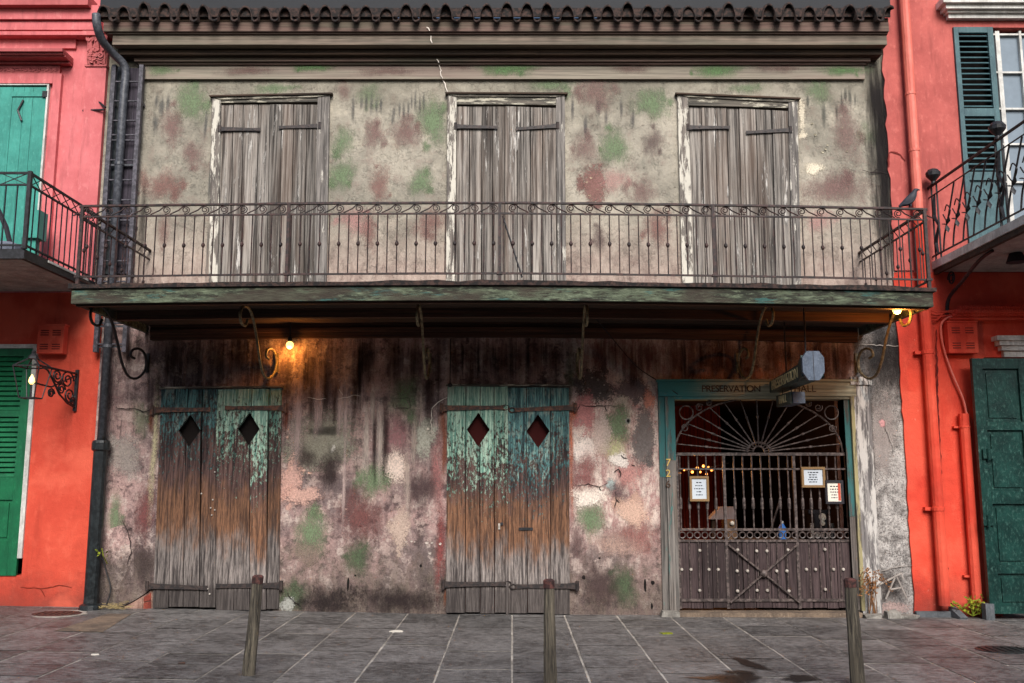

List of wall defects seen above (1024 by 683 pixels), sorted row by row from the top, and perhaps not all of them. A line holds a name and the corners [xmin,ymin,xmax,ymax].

leakage [798,98,808,139]
leakage [577,122,609,209]
leakage [803,163,862,200]
leakage [284,351,371,508]
leakage [365,393,388,460]
leakage [406,470,435,507]
leakage [299,588,435,612]